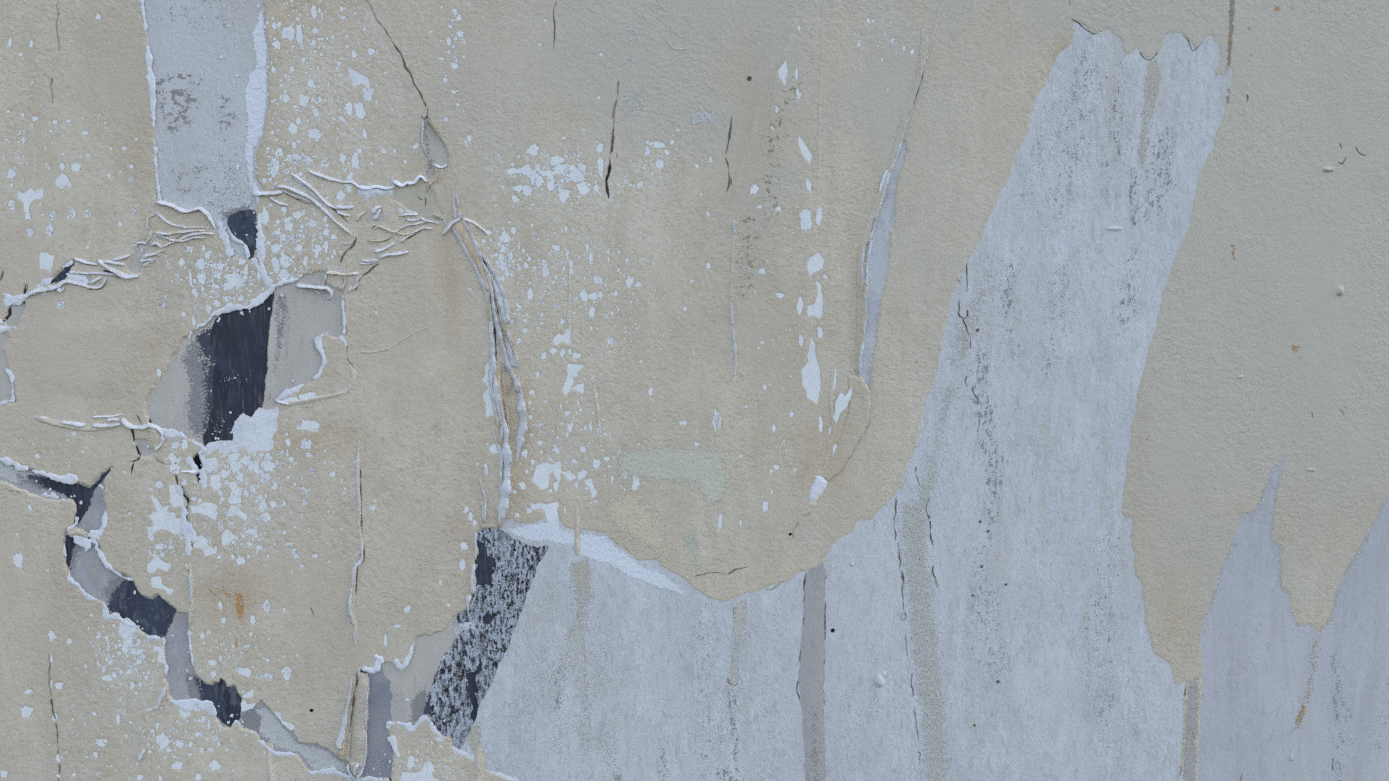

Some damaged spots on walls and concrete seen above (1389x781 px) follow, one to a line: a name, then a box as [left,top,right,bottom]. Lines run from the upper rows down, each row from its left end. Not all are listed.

crack [366,0,428,118]
peeling [0,0,808,781]
crack [605,81,619,198]
peeling [734,136,906,480]
peeling [823,18,1389,781]